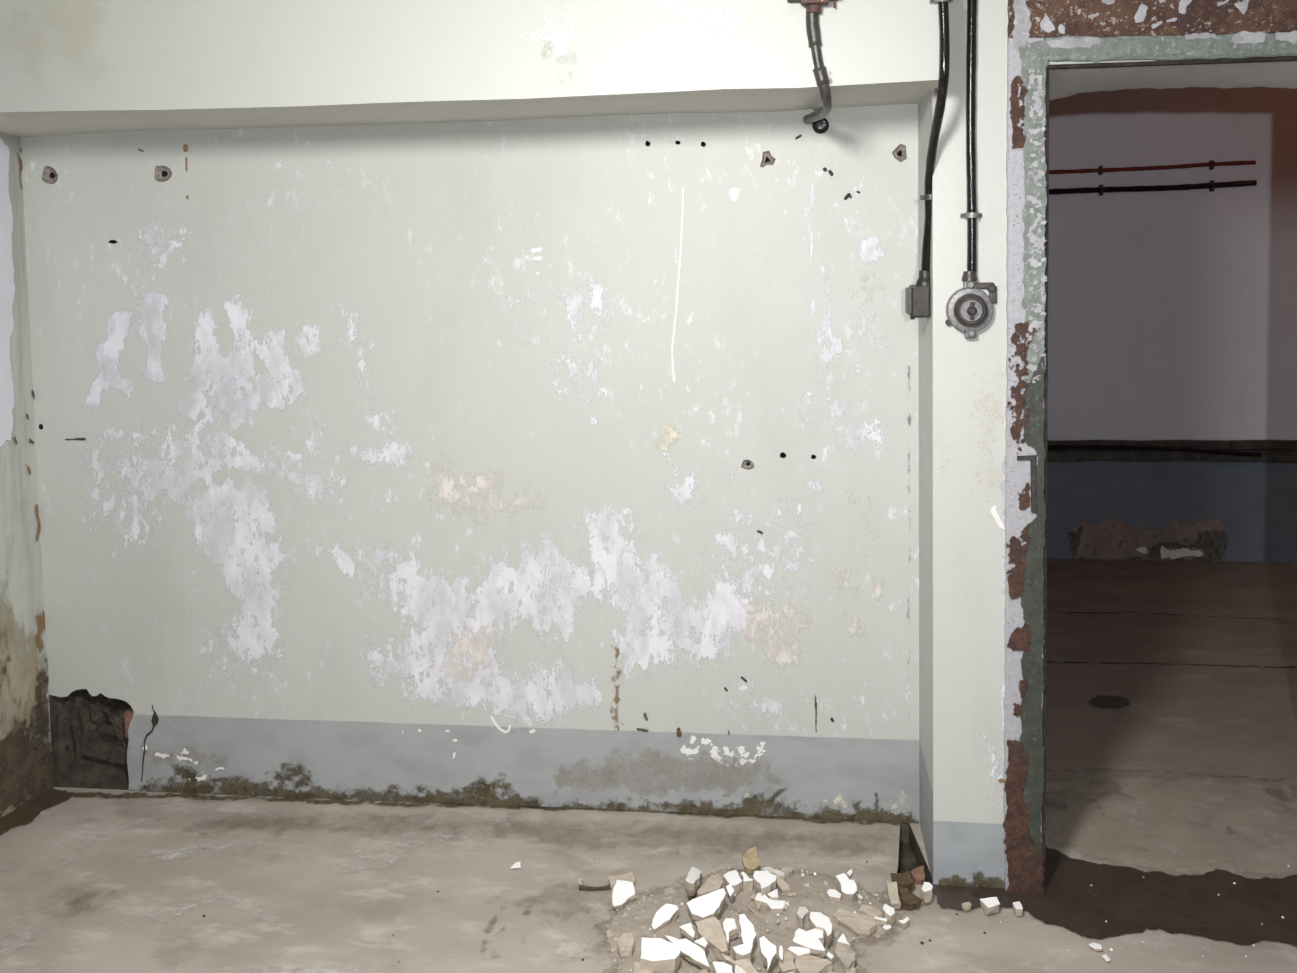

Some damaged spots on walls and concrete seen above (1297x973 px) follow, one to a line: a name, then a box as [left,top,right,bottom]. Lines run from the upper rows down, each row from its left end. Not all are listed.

corrosion [1009,75,1028,149]
corrosion [1006,320,1041,451]
peeling [76,221,828,734]
corrosion [1006,483,1031,600]
peeling [1073,516,1227,561]
corrosion [1007,625,1032,652]
flaking render [49,689,134,790]
leakage [0,601,919,845]
corrosion [1013,680,1029,716]
corrosion [998,740,1045,894]